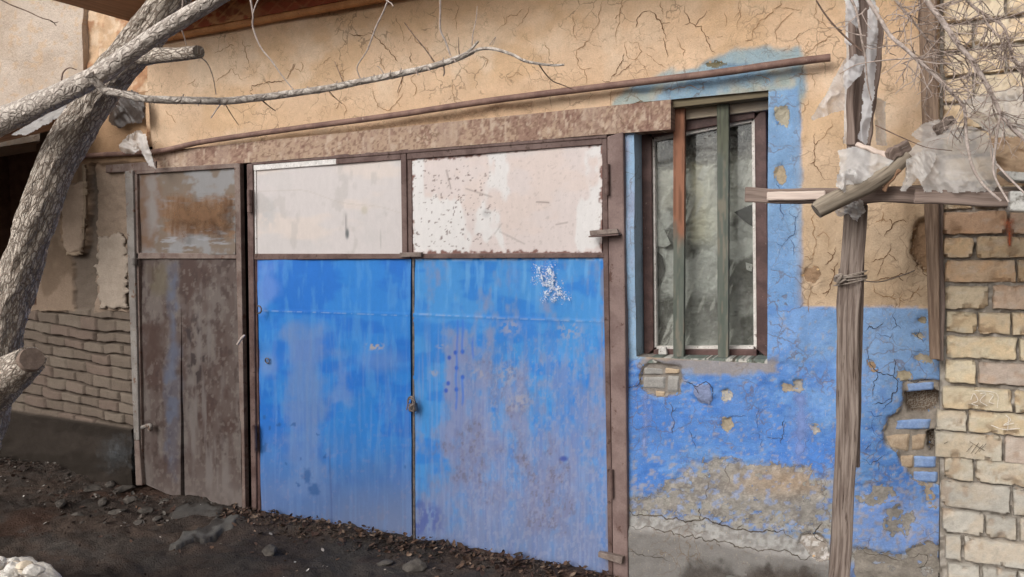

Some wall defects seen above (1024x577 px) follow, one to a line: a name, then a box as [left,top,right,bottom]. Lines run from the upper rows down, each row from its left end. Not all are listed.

crack [187,41,347,115]
crack [349,18,432,111]
crack [573,1,833,111]
peeling [530,264,570,305]
spalling [639,360,733,404]
peeling [721,416,734,432]
crack [730,408,810,452]
peeling [781,379,805,394]
crack [865,213,931,471]
spalling [882,353,939,509]
peeling [629,456,831,562]
peeling [852,479,939,577]